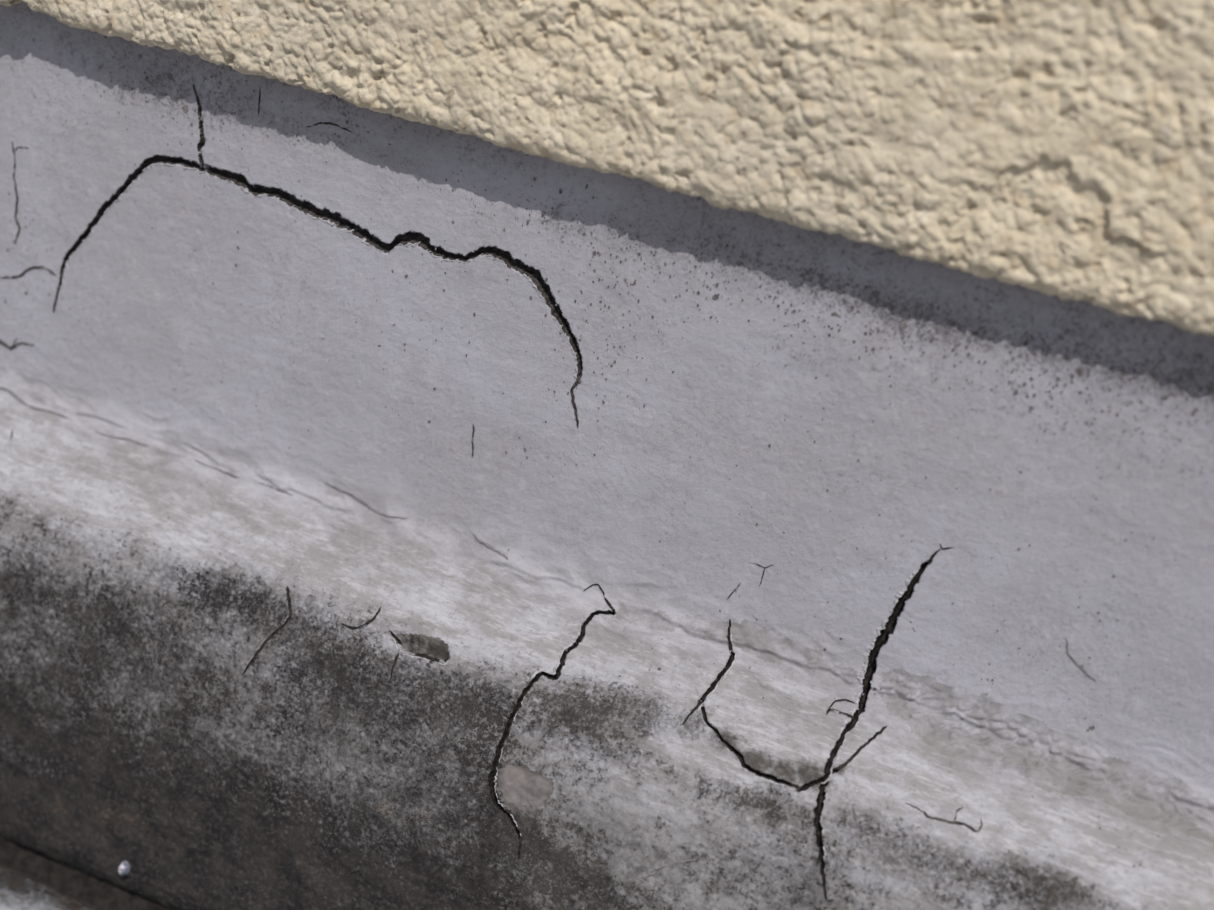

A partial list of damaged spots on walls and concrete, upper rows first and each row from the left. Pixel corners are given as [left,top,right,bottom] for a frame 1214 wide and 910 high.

damp [100,54,302,150]
crack [0,84,582,427]
damp [517,165,1213,469]
crack [0,387,68,442]
crack [94,430,148,446]
crack [195,460,292,495]
crack [242,586,292,675]
spalling [396,633,449,660]
crack [488,584,615,859]
damp [0,495,1118,910]
crack [682,543,953,901]
crack [906,803,983,832]